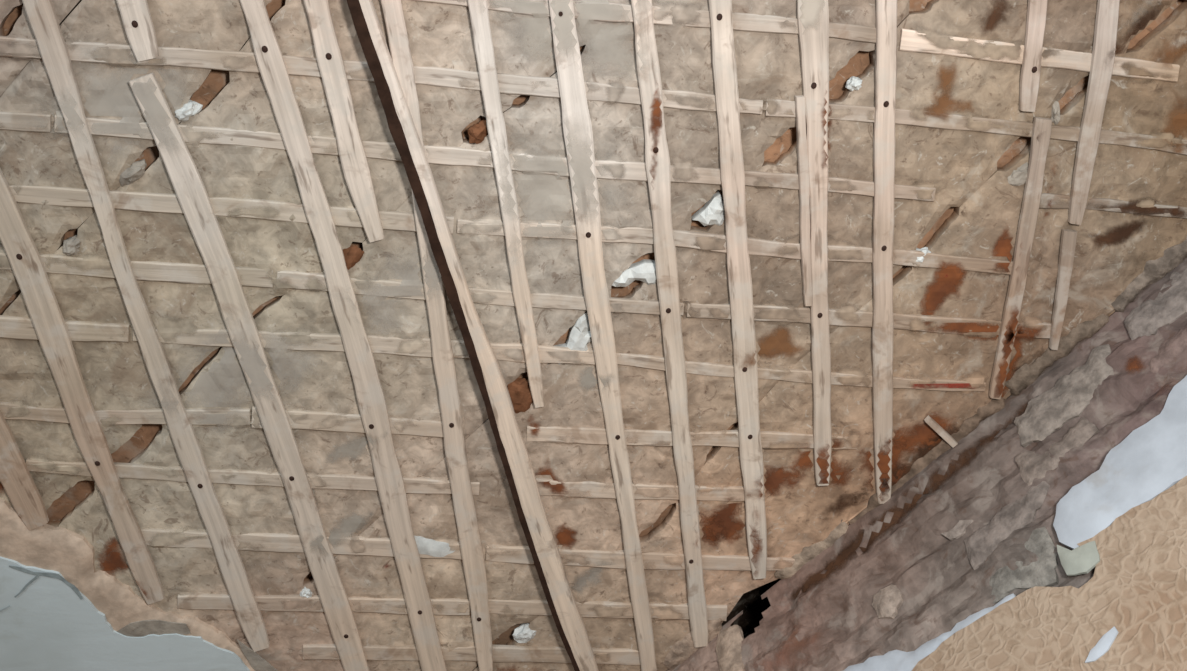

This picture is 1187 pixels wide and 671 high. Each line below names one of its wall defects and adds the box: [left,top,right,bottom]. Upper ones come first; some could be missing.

rust [927,69,970,117]
rust [993,230,1013,272]
rust [748,328,798,364]
rust [921,262,1040,398]
spalling [414,536,456,557]
rust [699,499,761,562]
peeling [1057,541,1100,576]
crack [0,565,83,612]
spalling [0,498,278,671]
peeling [1085,626,1119,663]